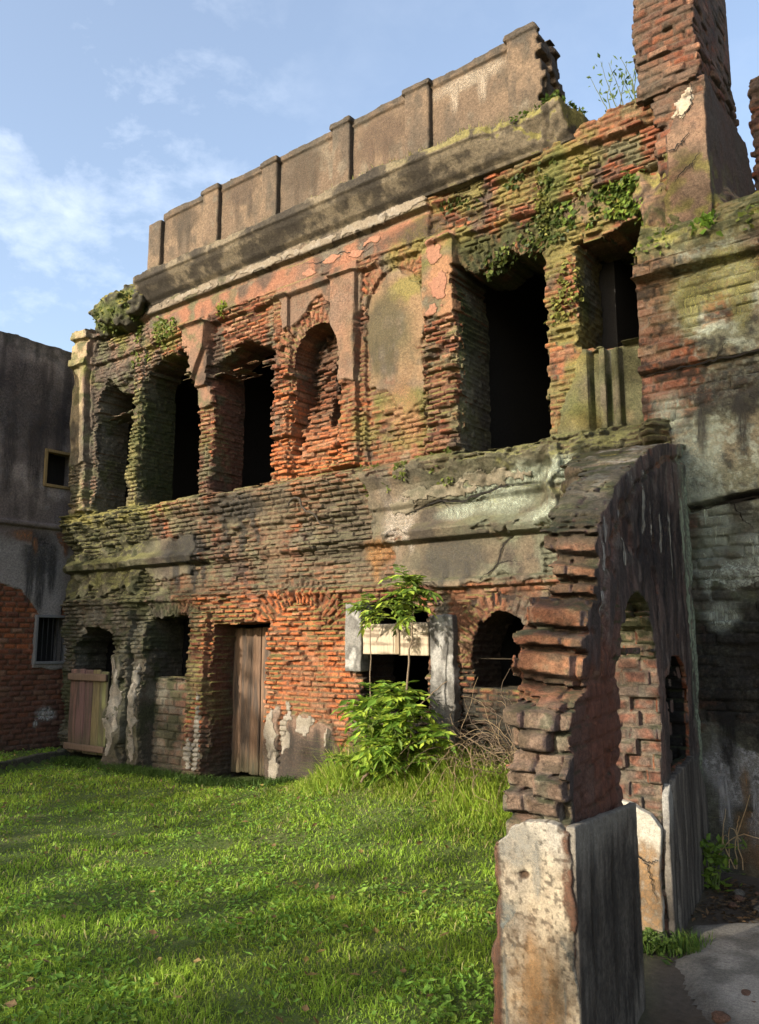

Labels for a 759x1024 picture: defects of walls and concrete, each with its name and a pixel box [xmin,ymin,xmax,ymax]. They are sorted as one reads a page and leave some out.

peeling [671,87,694,119]
peeling [158,196,427,307]
damp [389,216,452,247]
damp [686,362,759,449]
peeling [389,467,532,515]
damp [24,535,57,608]
crack [480,532,515,579]
spalling [193,501,389,781]
crack [638,856,658,901]